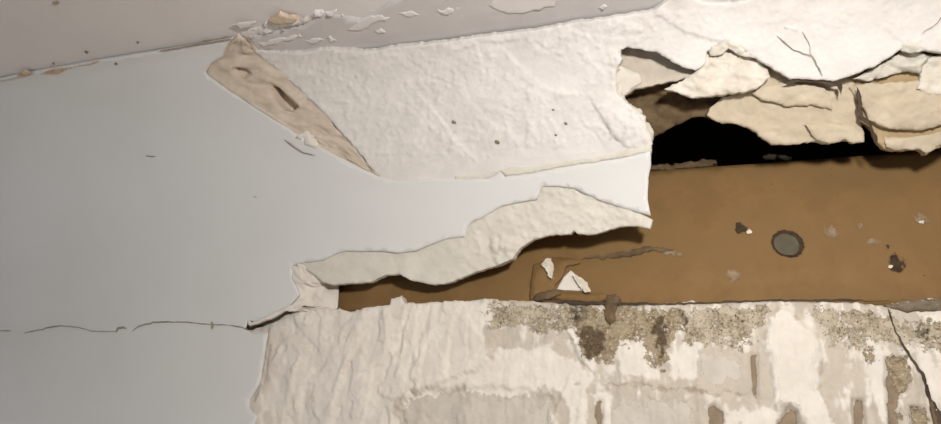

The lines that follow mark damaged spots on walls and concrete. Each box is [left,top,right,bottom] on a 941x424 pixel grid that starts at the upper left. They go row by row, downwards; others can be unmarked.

spalling [160,0,941,180]
crack [0,305,314,333]
spalling [248,186,941,424]
crack [538,299,941,424]
damp [863,346,913,393]
damp [895,406,930,424]